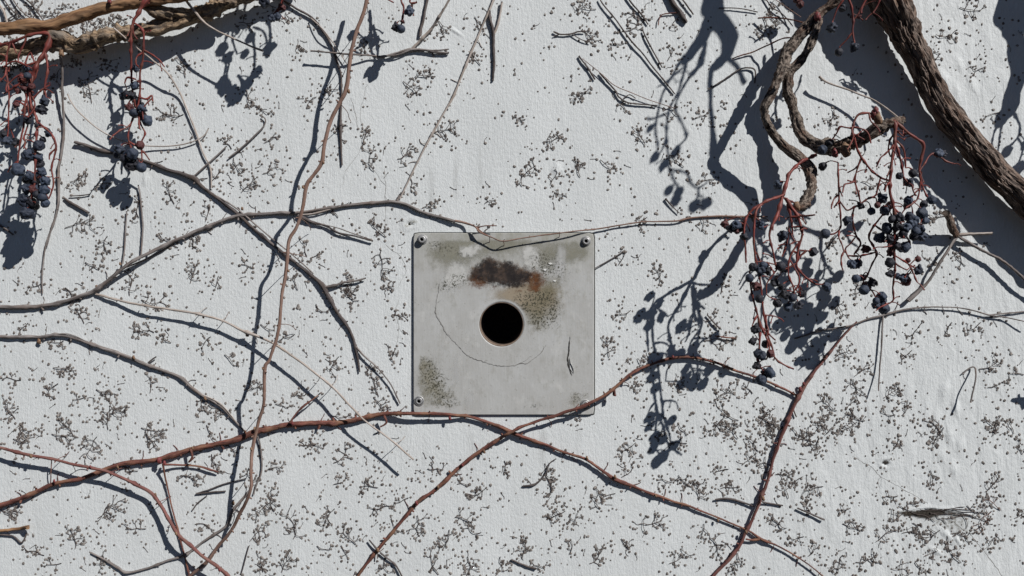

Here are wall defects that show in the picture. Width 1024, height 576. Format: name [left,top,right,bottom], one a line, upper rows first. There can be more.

corrosion [470,258,555,312]
crack [435,283,574,375]
mould [420,361,451,407]